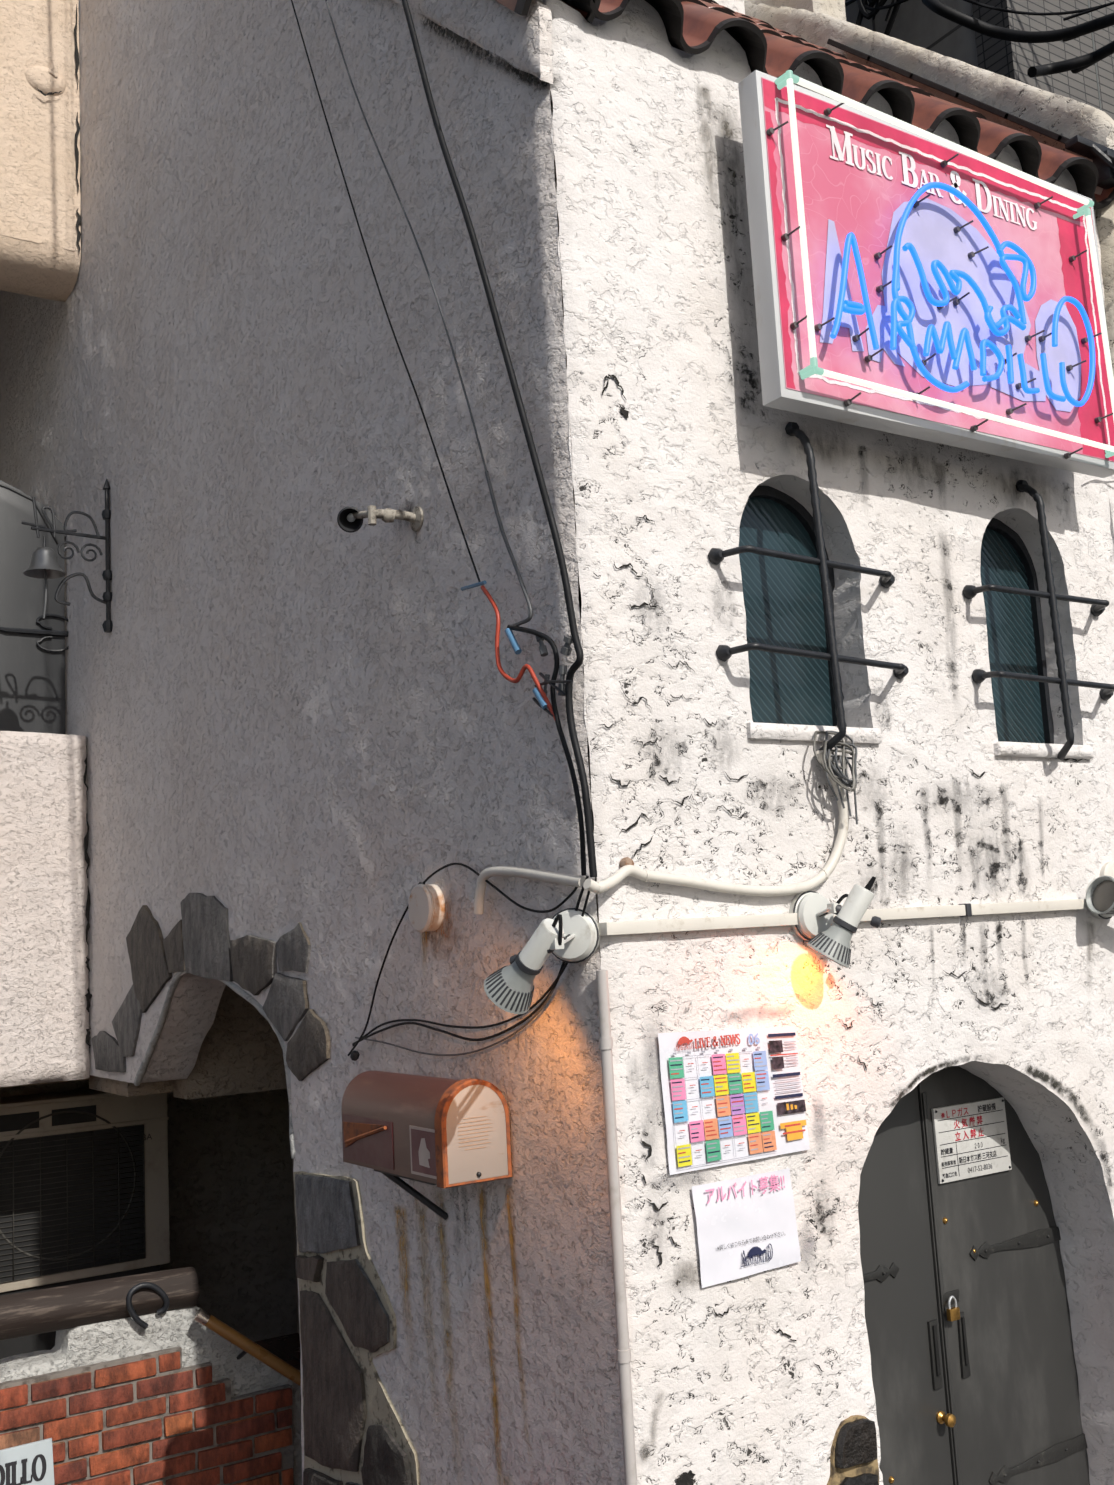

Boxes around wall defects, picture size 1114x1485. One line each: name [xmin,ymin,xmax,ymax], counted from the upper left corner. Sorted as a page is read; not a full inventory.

leakage [876,788,961,878]
leakage [956,822,1028,893]
leakage [979,923,1006,1005]
corrosion [506,1193,518,1324]
corrosion [465,1190,498,1442]